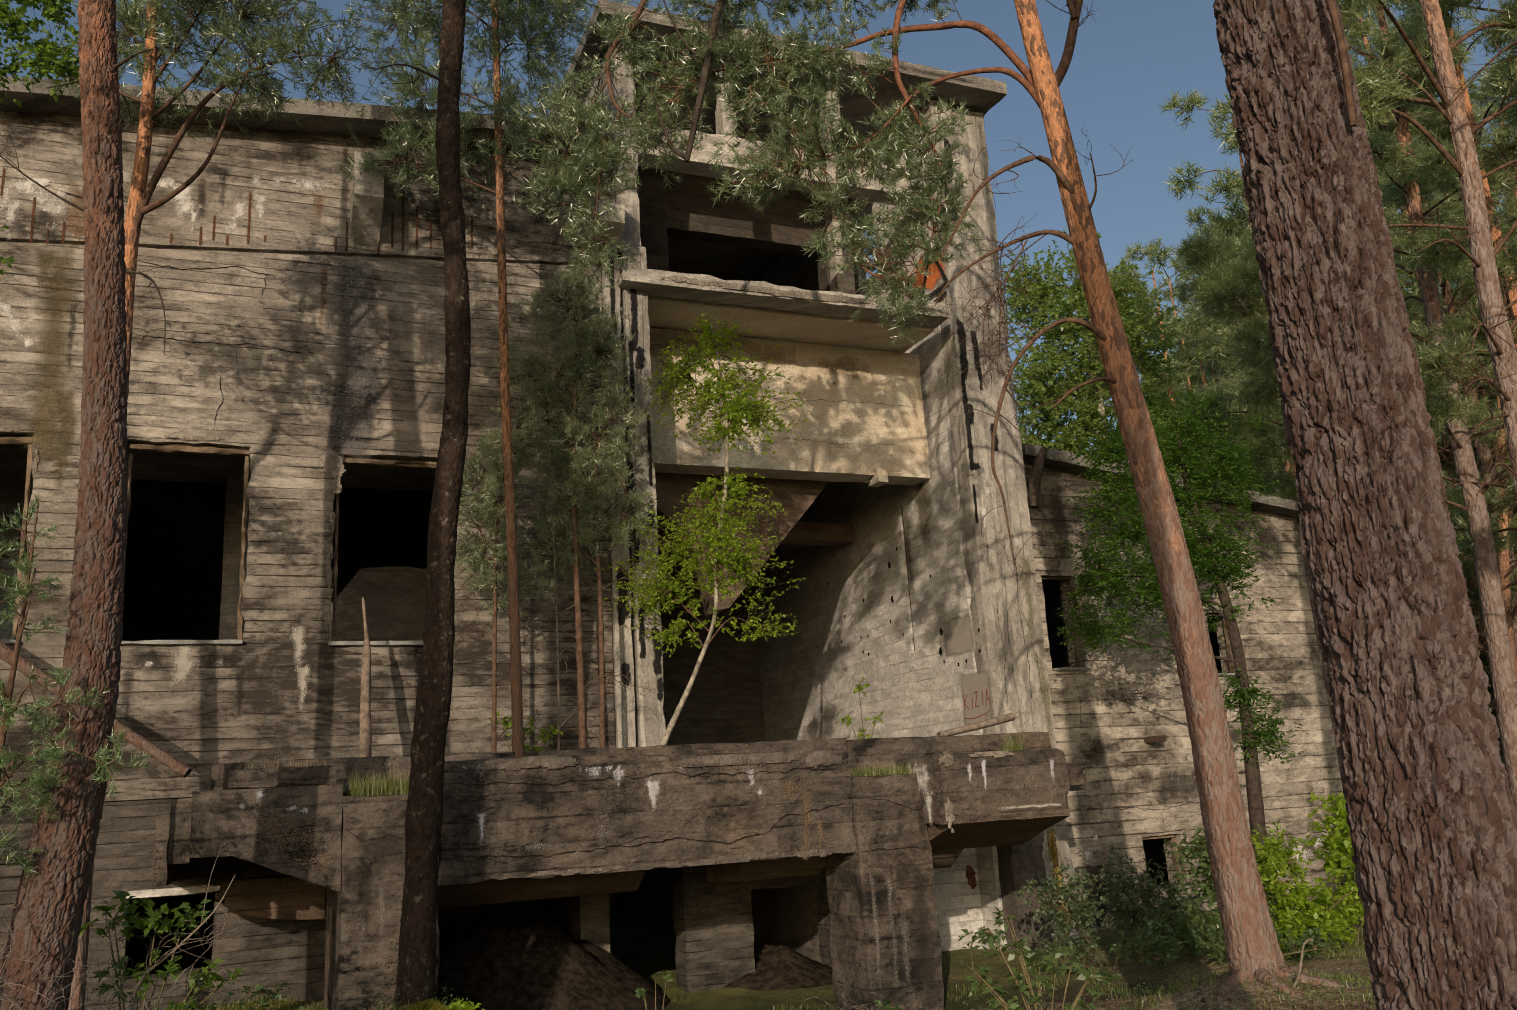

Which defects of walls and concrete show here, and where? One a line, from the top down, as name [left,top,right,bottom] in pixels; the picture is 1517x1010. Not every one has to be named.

corrosion [30,197,66,244]
corrosion [199,215,229,246]
corrosion [247,192,266,244]
corrosion [378,186,432,255]
water stain [0,251,75,483]
water stain [328,264,377,454]
water stain [920,367,930,432]
water stain [949,317,998,523]
water stain [609,251,664,701]
water stain [293,627,308,702]